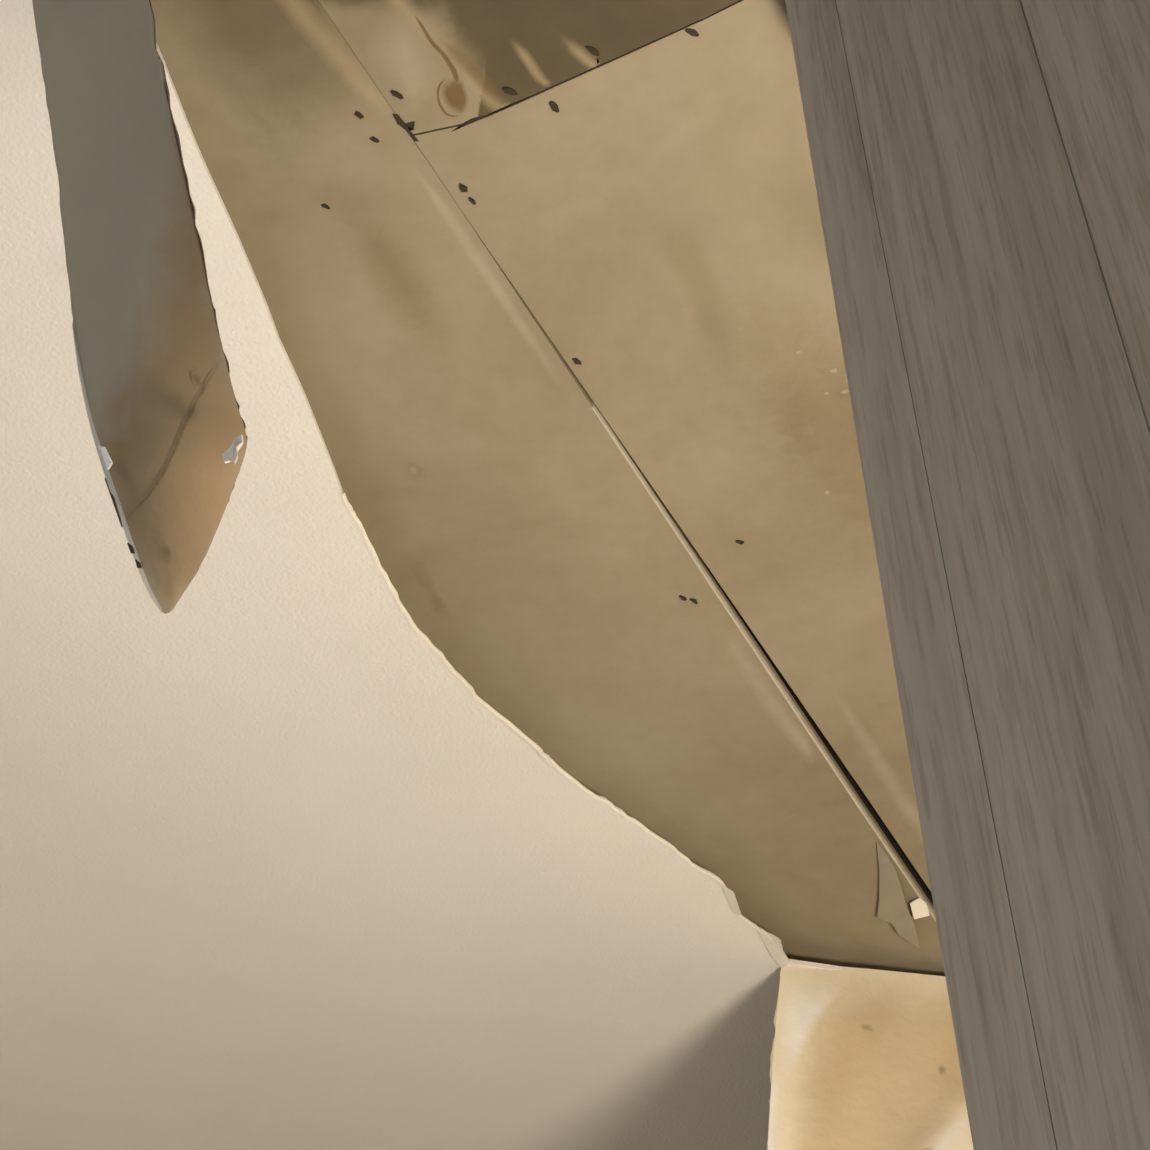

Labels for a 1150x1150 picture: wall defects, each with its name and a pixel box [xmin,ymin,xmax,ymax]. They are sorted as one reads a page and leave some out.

peeling [535,748,552,767]
peeling [721,884,742,916]
peeling [910,898,930,919]
peeling [758,930,790,968]